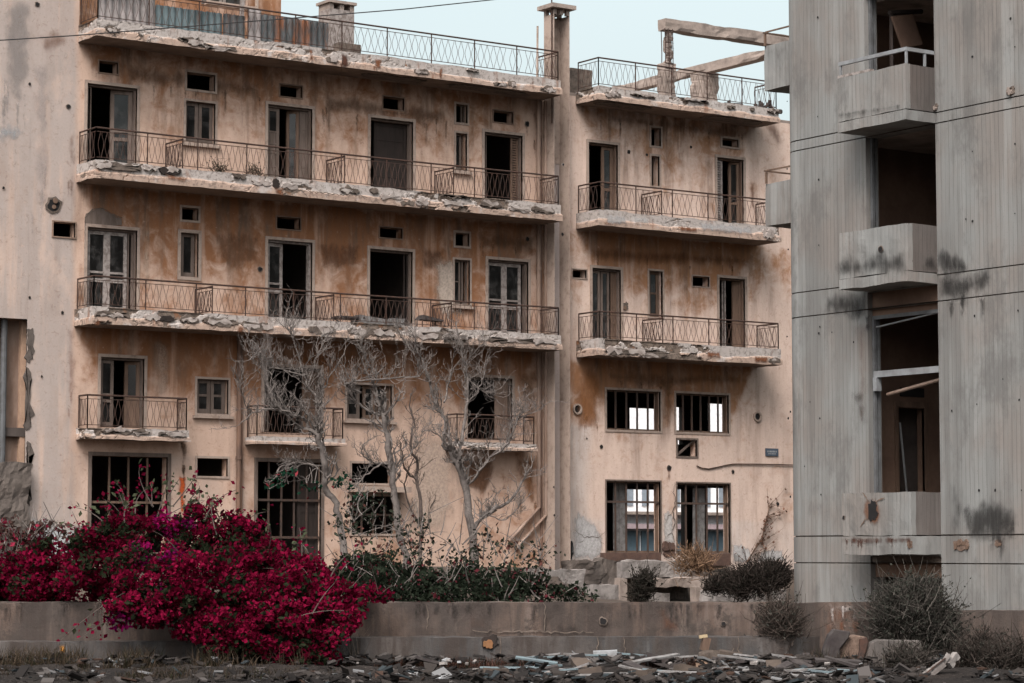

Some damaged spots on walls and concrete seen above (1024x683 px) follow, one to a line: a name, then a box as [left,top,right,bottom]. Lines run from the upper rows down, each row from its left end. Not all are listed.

spalling [361,68,430,84]
spalling [446,81,556,96]
spalling [96,161,182,175]
spalling [234,173,298,190]
spalling [339,184,429,206]
leakage [840,256,900,270]
leakage [929,254,987,310]
spalling [94,310,130,318]
spalling [144,312,273,332]
spalling [604,346,667,358]
spalling [23,328,43,468]
leakage [970,505,1014,543]